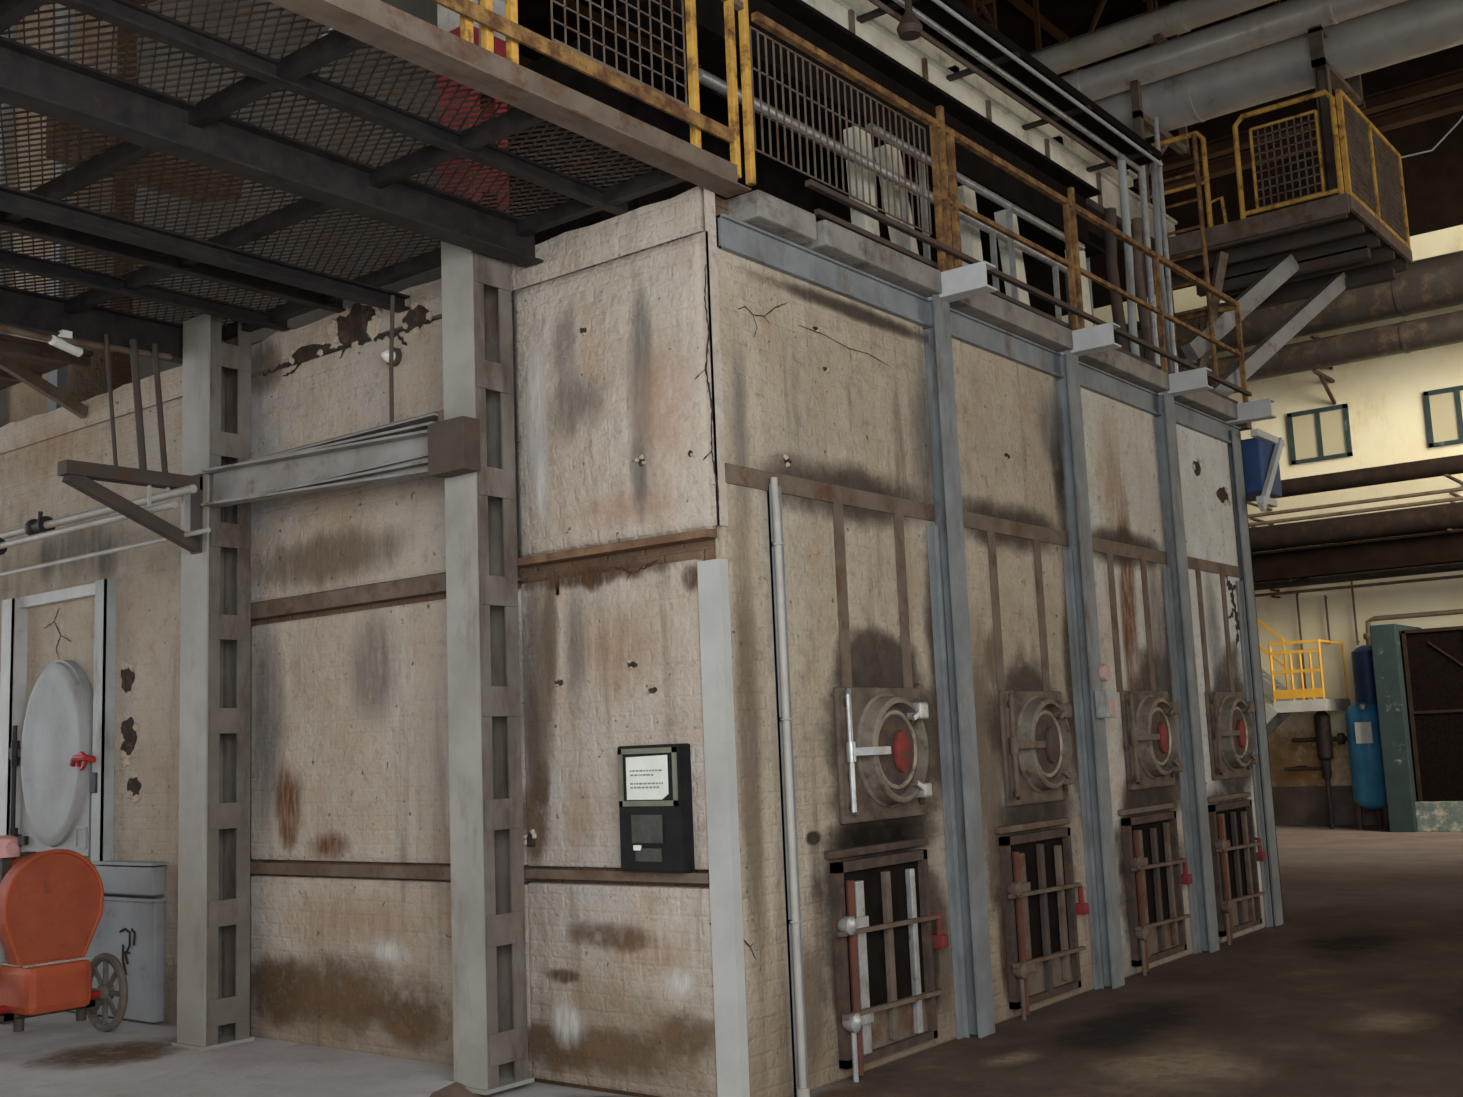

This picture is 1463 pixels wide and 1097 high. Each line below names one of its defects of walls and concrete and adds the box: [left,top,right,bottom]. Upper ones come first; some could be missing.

spalling [288,296,433,365]
crack [586,234,892,518]
rust [1121,562,1136,669]
spalling [120,660,135,697]
spalling [114,717,141,803]
rust [277,777,299,844]
water stain [576,927,643,950]
water stain [250,941,436,1045]
water stain [528,1004,710,1072]